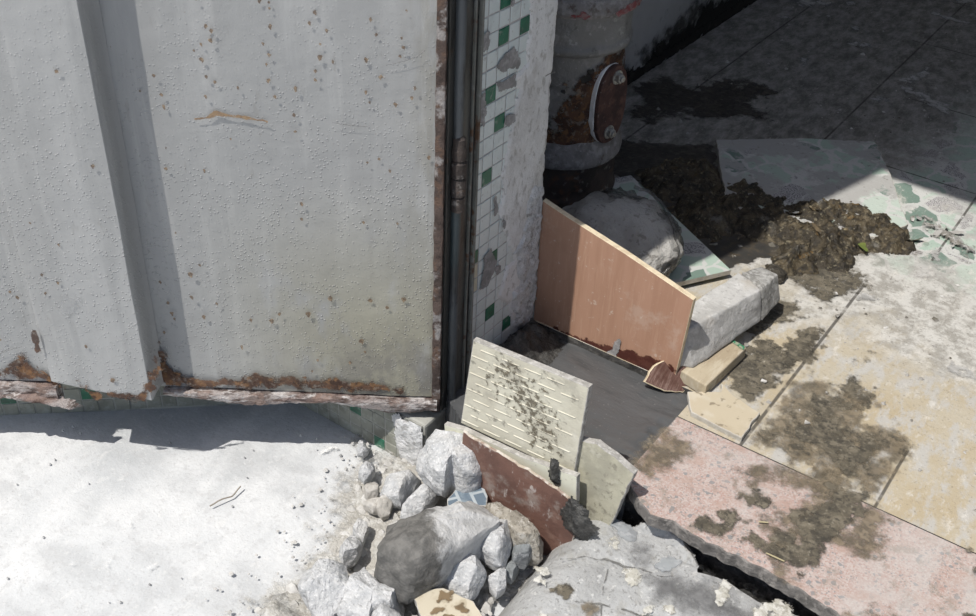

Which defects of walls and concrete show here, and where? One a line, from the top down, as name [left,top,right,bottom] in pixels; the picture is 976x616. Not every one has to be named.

corrosion [194,111,268,123]
corrosion [546,49,626,145]
damp [625,0,778,124]
flaking render [510,185,544,330]
corrosion [0,330,66,389]
corrosion [76,331,404,403]